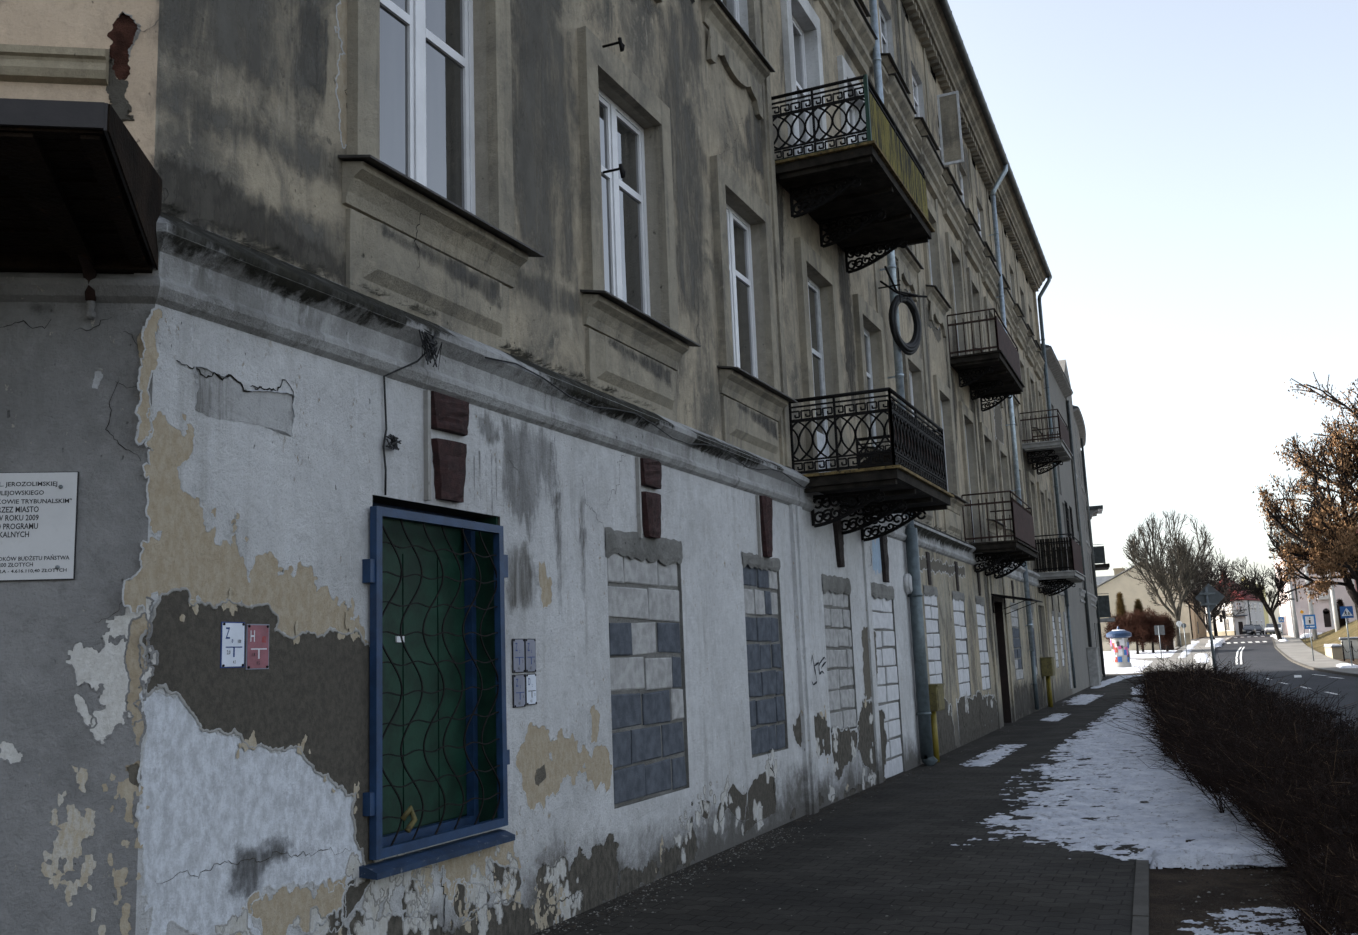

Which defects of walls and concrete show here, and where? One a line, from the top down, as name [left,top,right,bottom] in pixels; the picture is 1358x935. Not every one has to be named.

spalling [106,11,141,122]
water stain [159,0,327,115]
water stain [159,86,336,177]
water stain [158,154,346,286]
water stain [643,0,707,313]
peeling [41,307,887,935]